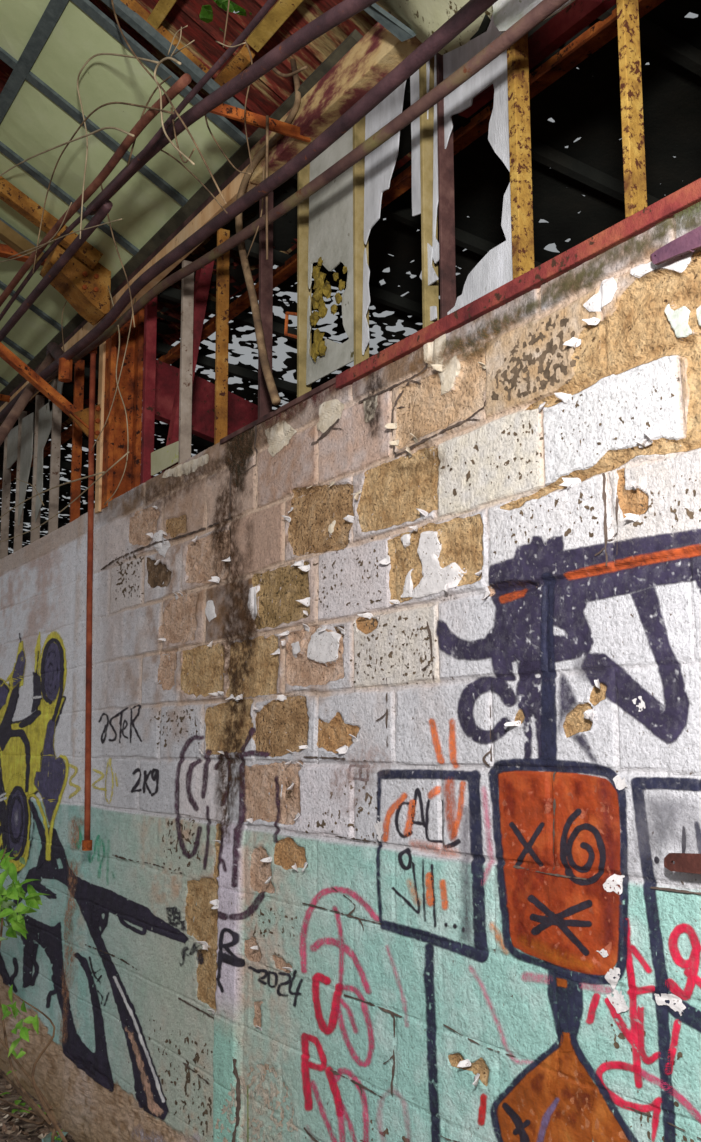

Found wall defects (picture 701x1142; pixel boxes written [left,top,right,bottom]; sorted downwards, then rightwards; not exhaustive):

leakage [213,430,259,835]
peeling [114,251,701,895]
peeling [162,815,221,1015]
peeling [244,908,298,973]